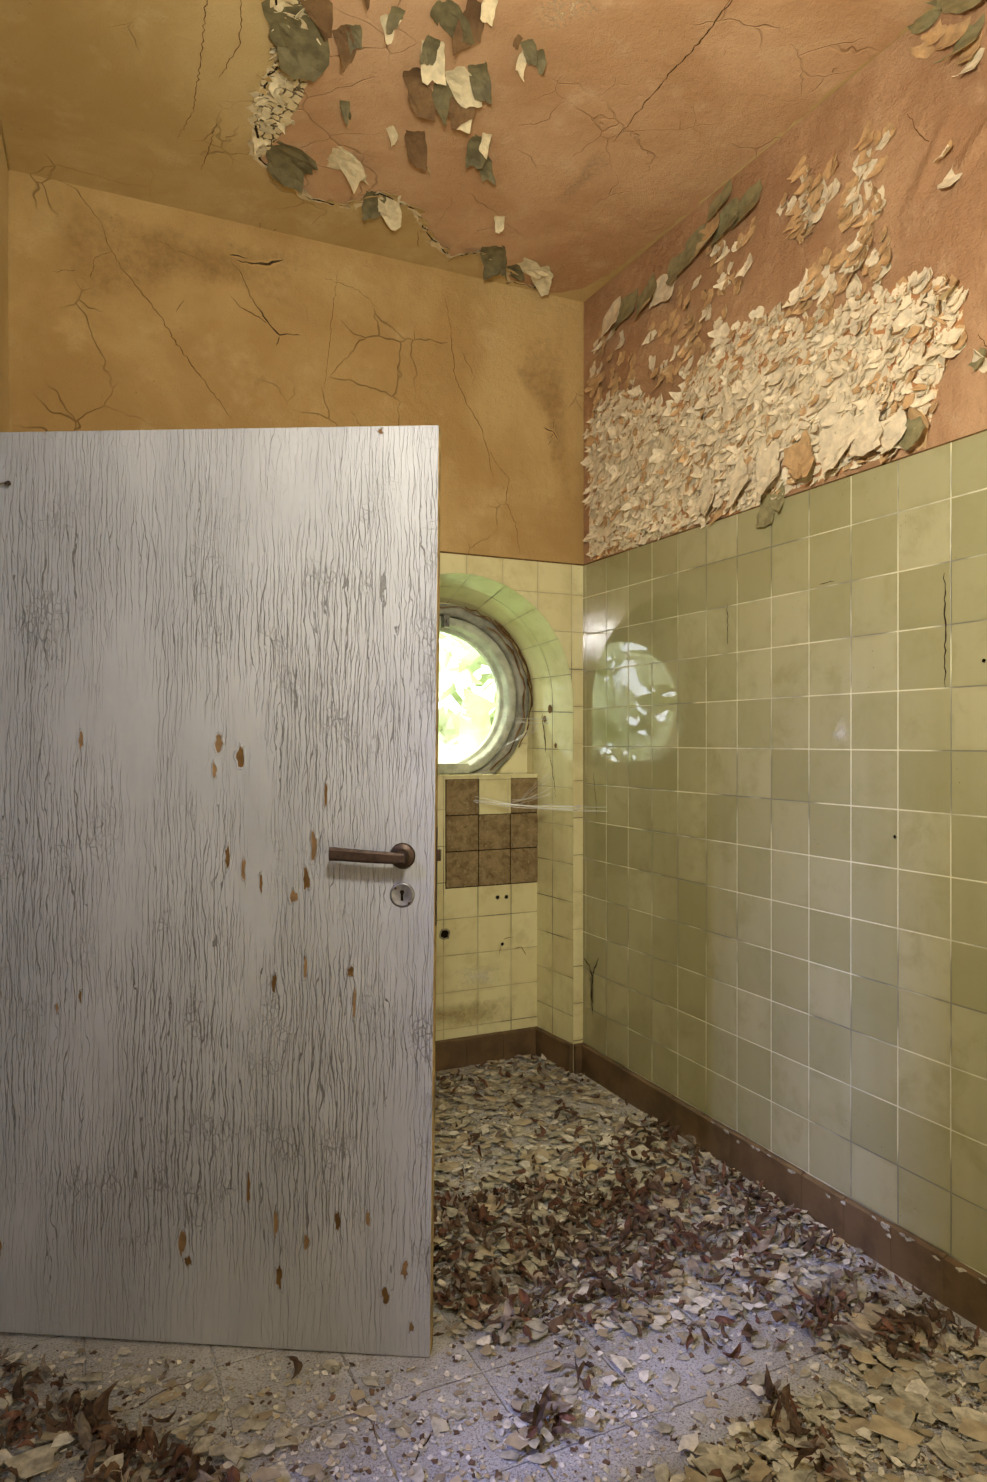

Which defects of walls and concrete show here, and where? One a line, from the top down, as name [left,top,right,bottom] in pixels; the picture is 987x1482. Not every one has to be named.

crack [177,0,243,170]
crack [615,0,732,140]
crack [54,180,232,420]
spalling [230,253,283,268]
crack [159,241,373,388]
peeling [246,0,987,560]
crack [445,299,520,552]
peeling [445,778,538,889]